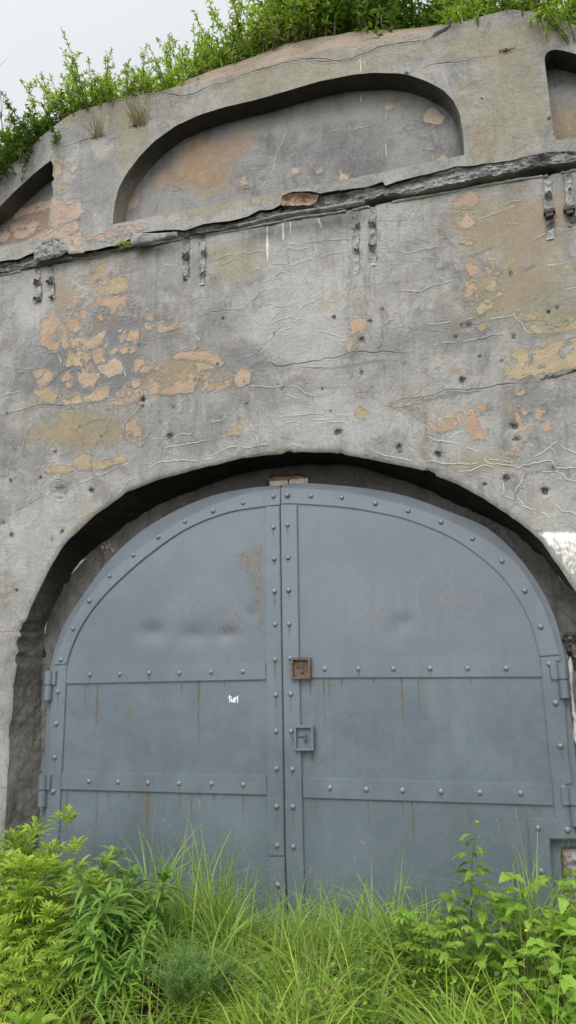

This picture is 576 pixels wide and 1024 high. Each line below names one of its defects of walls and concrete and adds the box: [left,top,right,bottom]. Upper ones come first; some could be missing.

crack [97,24,528,107]
spalling [0,105,576,410]
crack [0,238,532,493]
flaking render [424,396,494,442]
flaking render [499,333,576,457]
crack [373,432,576,531]